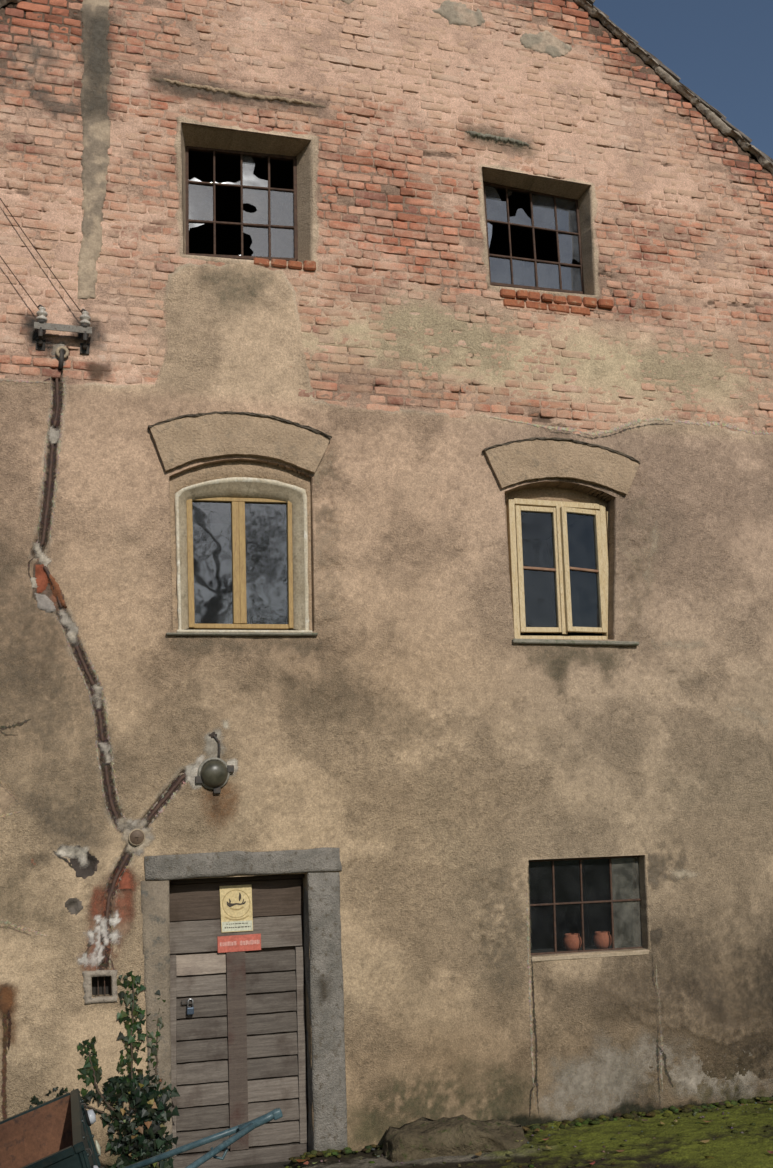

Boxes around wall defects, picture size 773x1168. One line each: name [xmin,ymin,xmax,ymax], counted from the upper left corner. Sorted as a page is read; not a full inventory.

flaking render [30,558,67,613]
flaking render [53,845,99,879]
flaking render [65,870,133,971]
rust [0,984,15,1120]
crack [526,866,539,1117]
crack [652,956,673,1104]